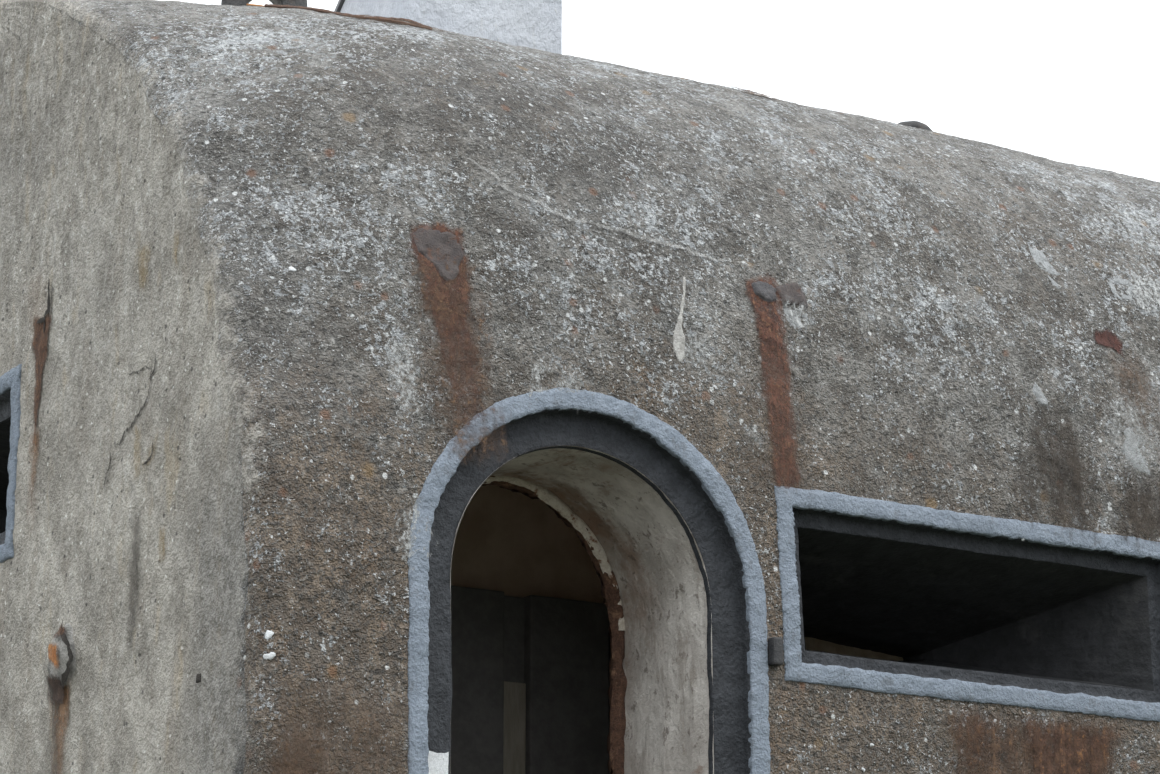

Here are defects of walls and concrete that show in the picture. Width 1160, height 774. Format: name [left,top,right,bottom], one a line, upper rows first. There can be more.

corrosion [31,313,51,500]
crack [103,358,156,500]
corrosion [410,222,504,452]
corrosion [747,276,808,487]
corrosion [1095,330,1148,405]
corrosion [50,685,69,774]